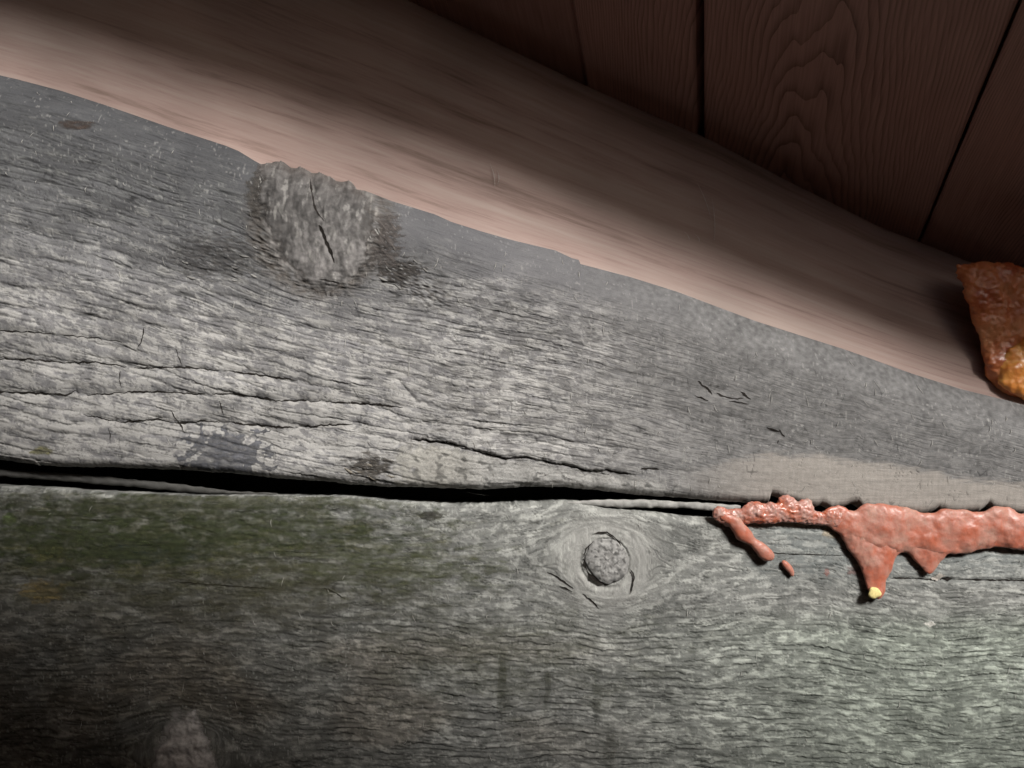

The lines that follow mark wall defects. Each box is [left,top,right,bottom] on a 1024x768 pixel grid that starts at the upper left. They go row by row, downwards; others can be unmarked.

water stain [174,422,278,475]
crack [412,439,659,483]